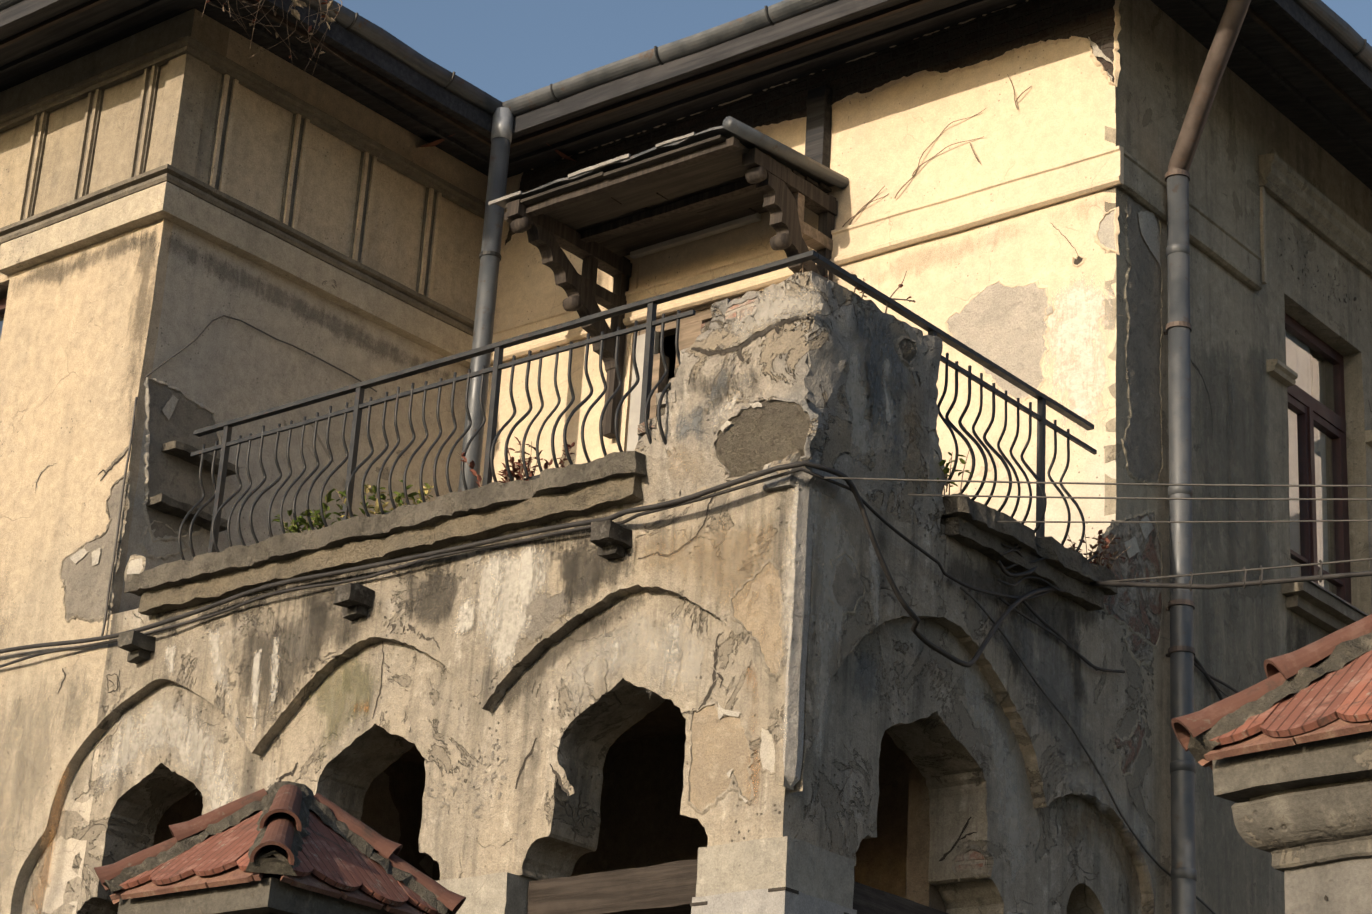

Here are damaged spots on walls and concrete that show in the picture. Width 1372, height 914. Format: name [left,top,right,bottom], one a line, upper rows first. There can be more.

flaking render [517,0,1121,193]
flaking render [720,294,764,327]
flaking render [893,335,919,368]
peeling [945,277,1055,403]
peeling [59,377,223,624]
flaking render [713,394,818,482]
damp [238,625,282,728]
damp [158,567,377,698]
damp [405,548,451,619]
damp [455,515,636,666]
crack [692,632,723,713]
flaking render [1097,510,1165,649]